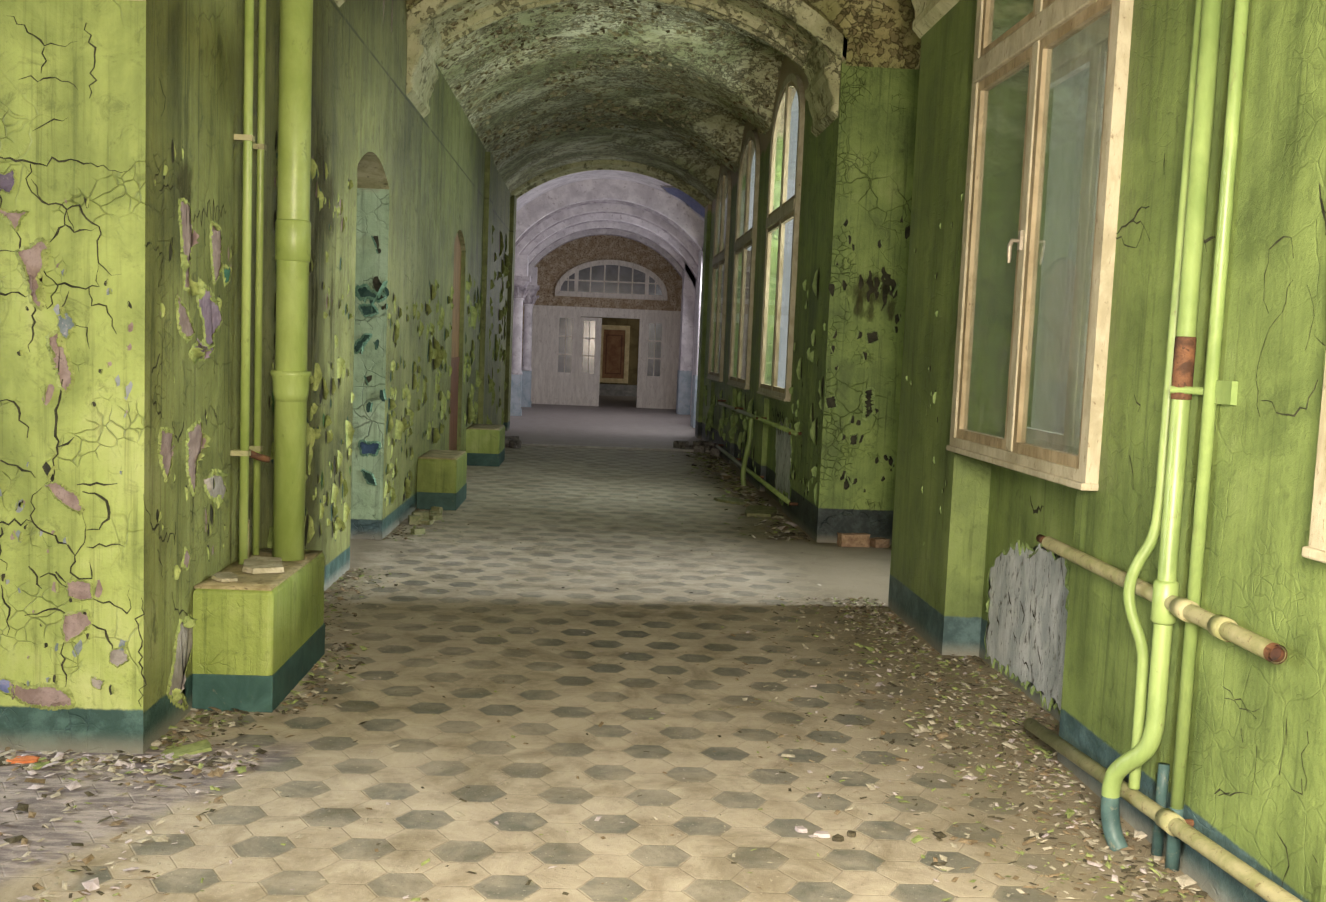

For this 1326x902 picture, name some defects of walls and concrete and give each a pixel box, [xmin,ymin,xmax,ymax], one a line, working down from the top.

peeling [0,169,77,406]
peeling [160,197,232,364]
crack [0,379,194,706]
crack [152,336,184,442]
peeling [158,409,228,561]
peeling [305,225,511,550]
peeling [775,322,879,506]
peeling [0,675,76,711]
peeling [167,613,198,711]
peeling [984,540,1070,715]
crack [1214,685,1309,796]
crack [1277,833,1317,887]